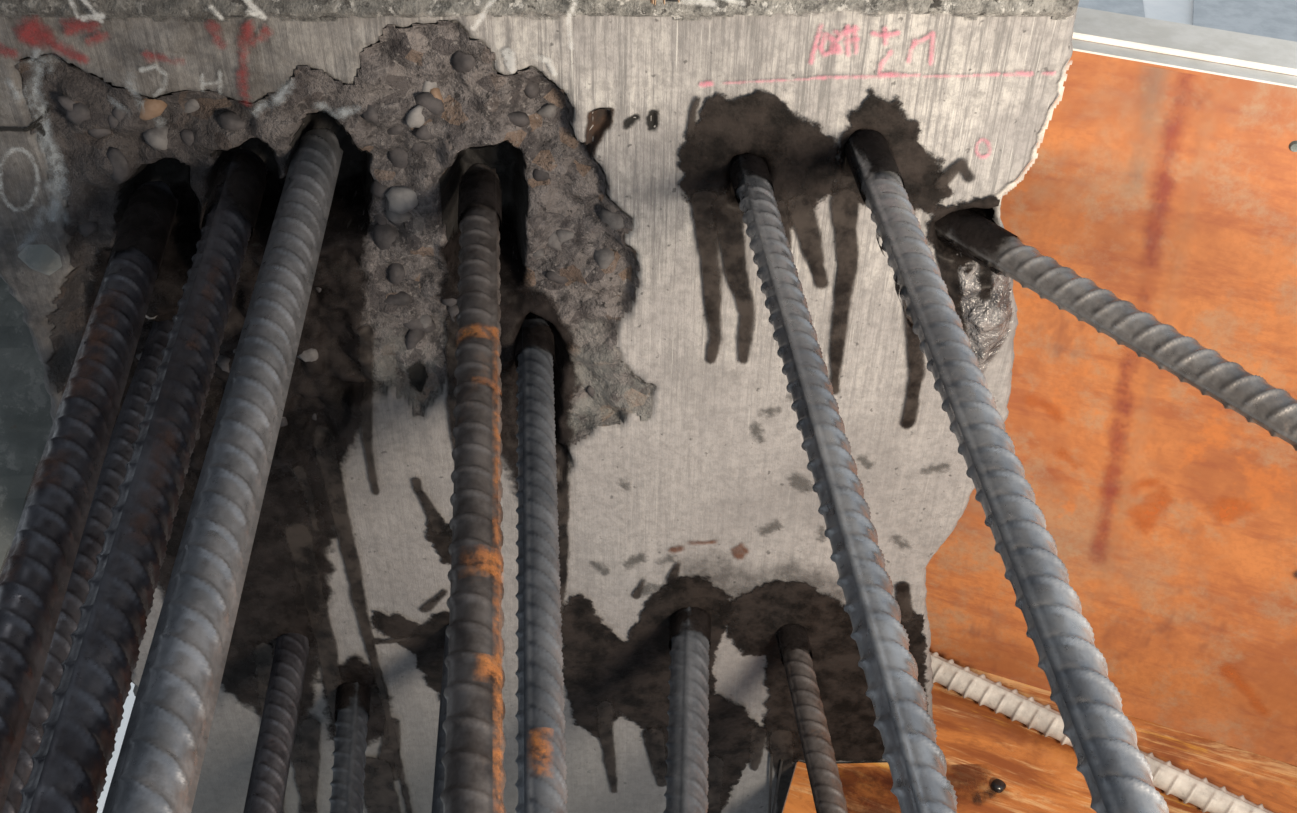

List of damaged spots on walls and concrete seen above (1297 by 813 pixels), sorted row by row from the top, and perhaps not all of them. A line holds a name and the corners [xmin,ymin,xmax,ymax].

leakage [691,186,755,364]
leakage [777,188,859,395]
leakage [901,300,926,429]
spalling [0,21,655,813]
leakage [284,424,412,813]
leakage [420,590,448,612]
leakage [896,582,913,622]
leakage [596,701,618,793]
leakage [642,728,667,787]
leakage [707,757,724,813]
leakage [749,727,794,813]
leakage [946,764,995,803]